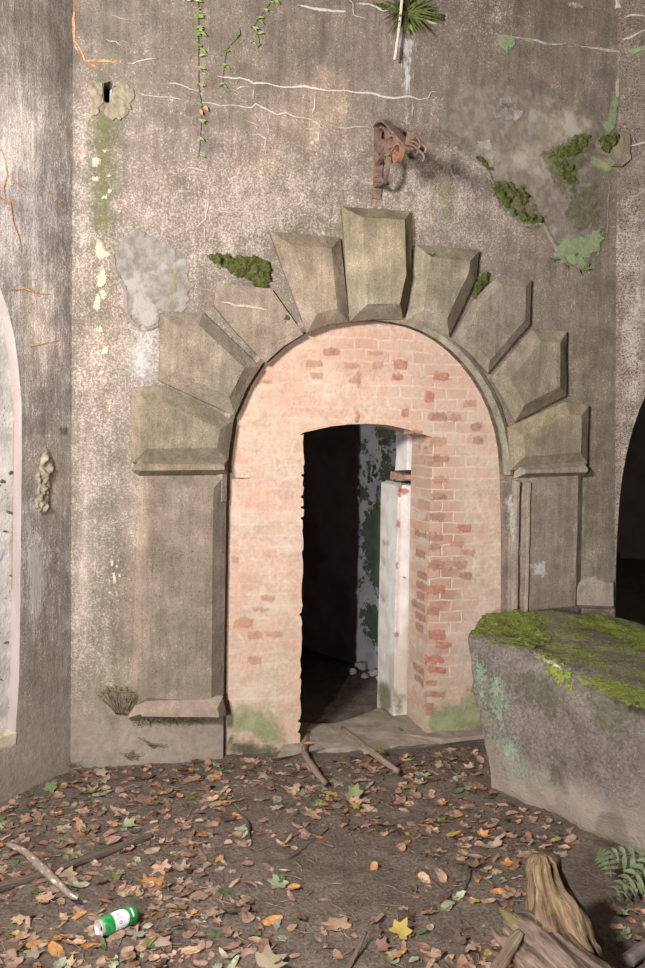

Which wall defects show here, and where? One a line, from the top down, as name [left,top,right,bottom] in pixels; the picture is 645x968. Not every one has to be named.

crack [300,0,392,19]
crack [72,10,155,67]
crack [499,14,645,100]
crack [133,72,442,154]
spalling [111,229,195,331]
peeling [391,360,407,380]
peeling [433,372,449,381]
peeling [425,391,475,422]
peeling [471,423,483,444]
peeling [353,426,448,655]